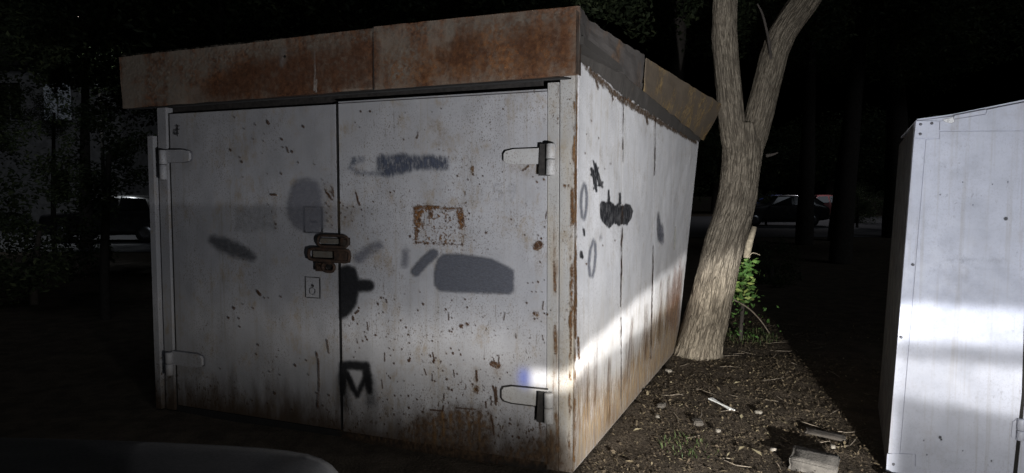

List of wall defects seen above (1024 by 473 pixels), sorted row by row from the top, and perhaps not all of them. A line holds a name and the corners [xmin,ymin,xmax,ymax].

corrosion [409,205,466,246]
corrosion [539,90,679,463]